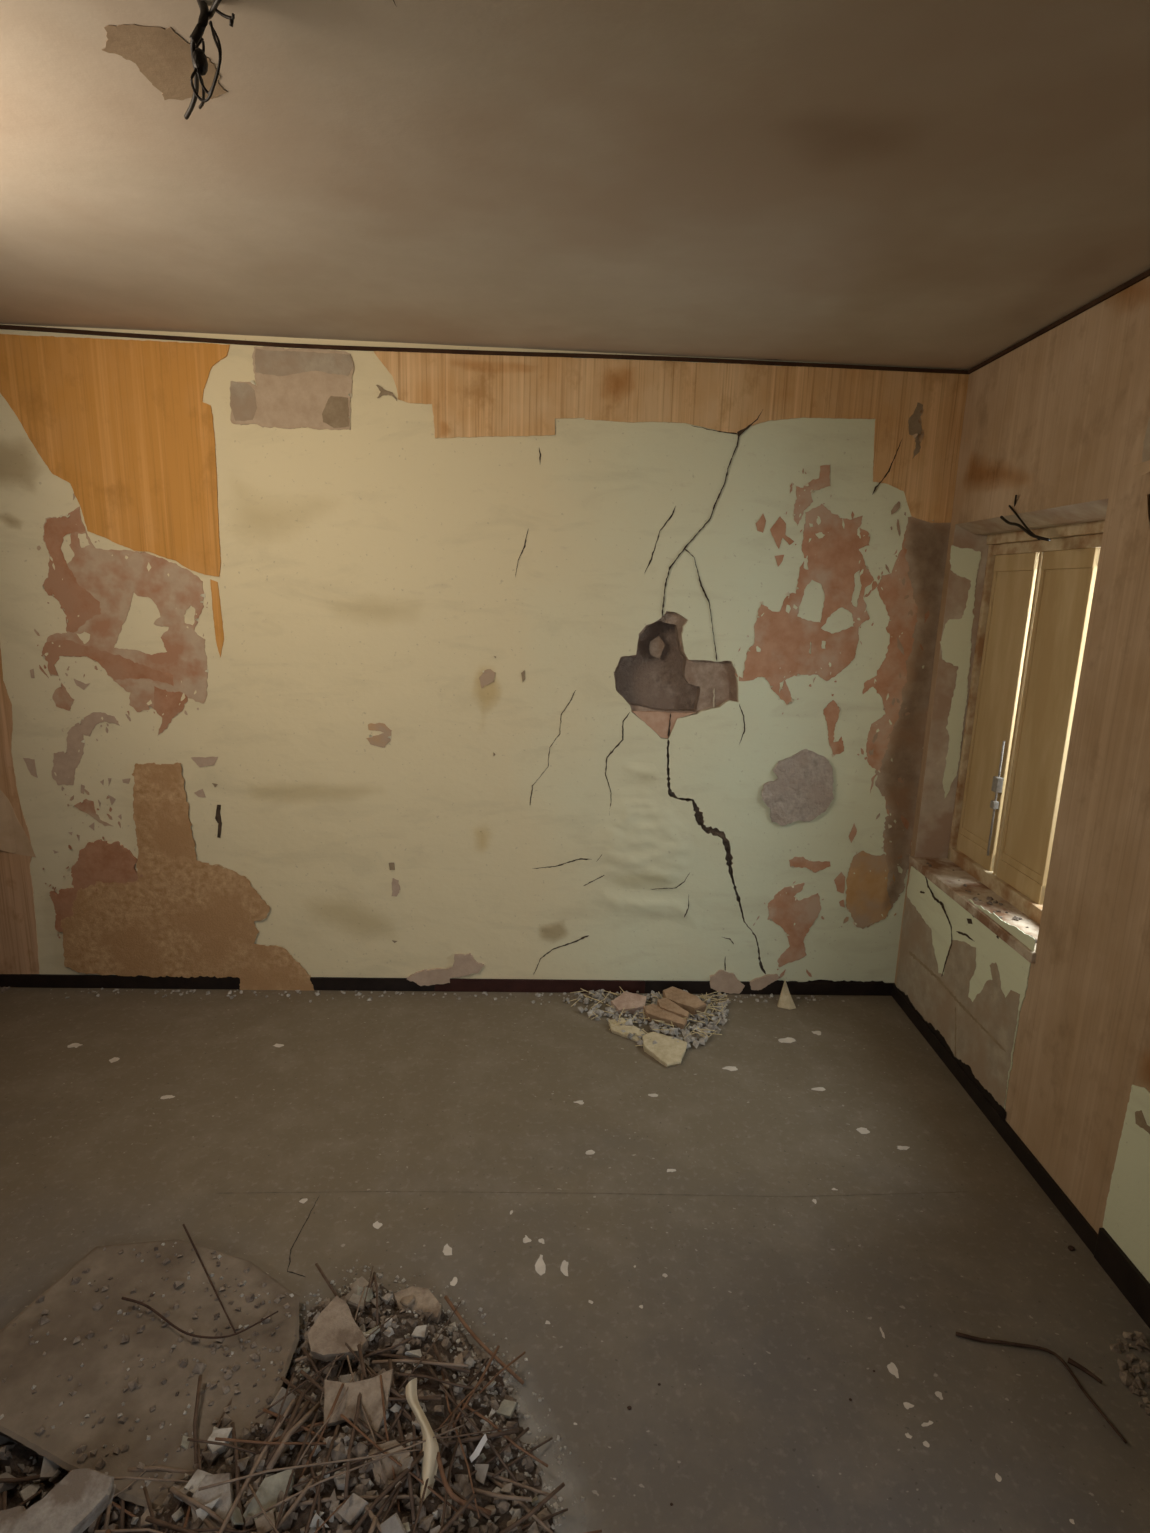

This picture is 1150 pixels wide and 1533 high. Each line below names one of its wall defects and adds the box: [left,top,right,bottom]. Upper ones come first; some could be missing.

spalling [102,24,227,100]
spalling [230,346,354,430]
spalling [376,385,397,401]
spalling [908,403,924,458]
crack [644,410,763,660]
spalling [23,493,314,991]
crack [605,712,630,815]
peeling [614,465,1036,1109]
crack [652,873,690,917]
crack [666,713,766,974]